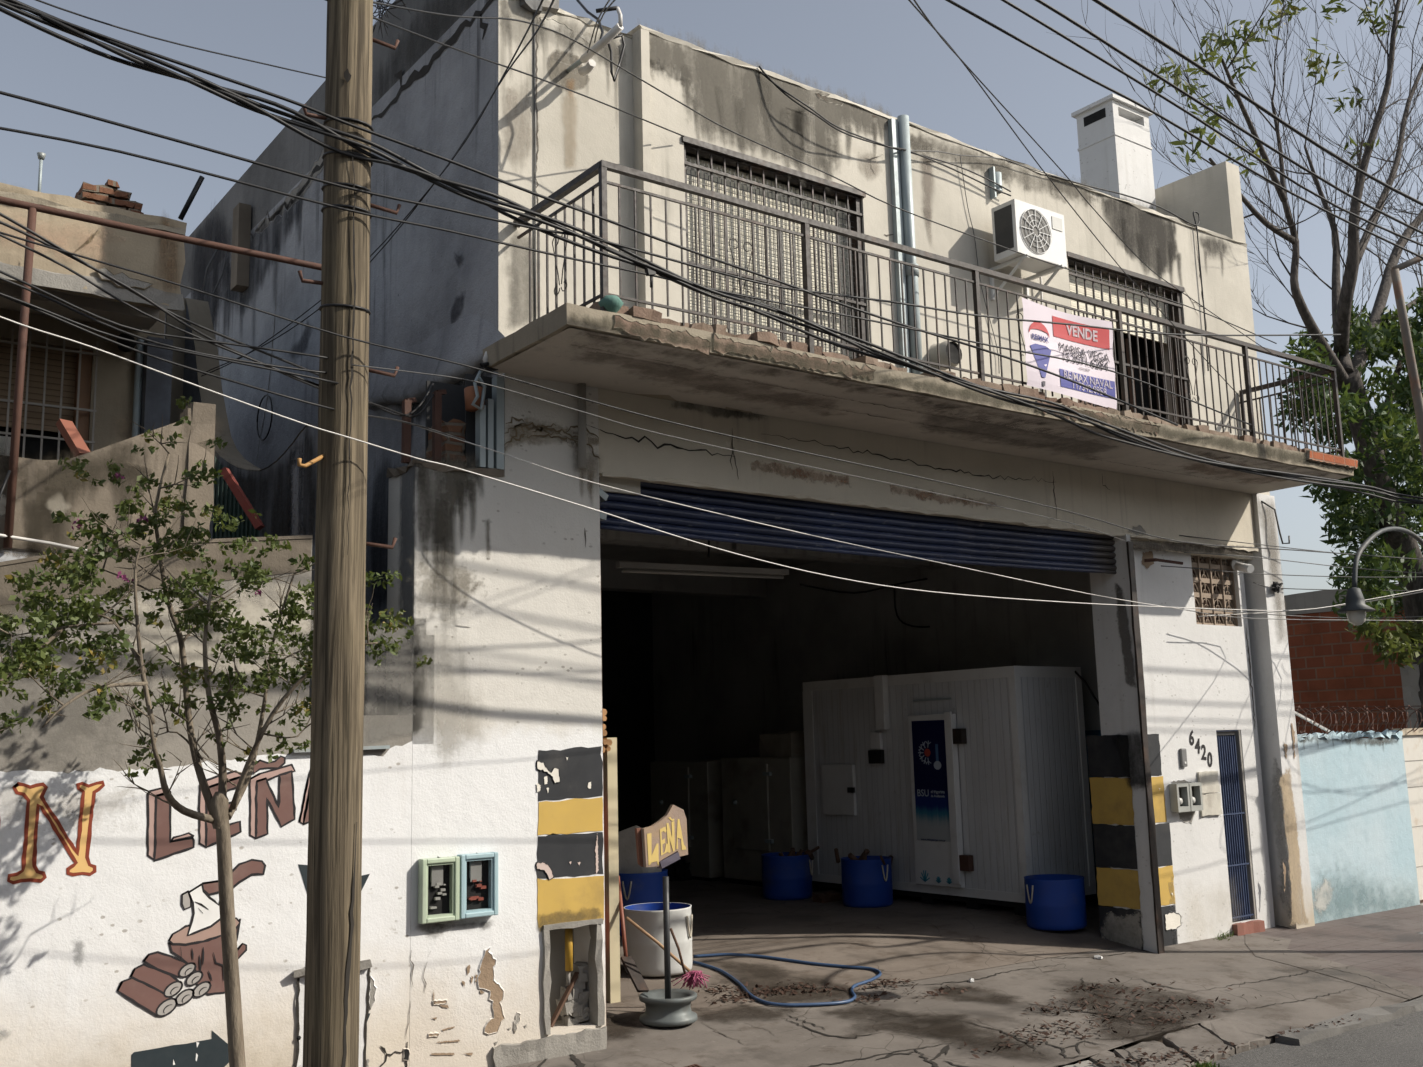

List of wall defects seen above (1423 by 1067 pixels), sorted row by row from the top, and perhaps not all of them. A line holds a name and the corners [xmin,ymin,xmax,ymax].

water stain [535,16,623,82]
water stain [649,34,890,198]
water stain [910,135,1185,293]
water stain [1201,239,1225,262]
water stain [451,296,463,323]
water stain [371,456,489,647]
peeling [536,757,568,792]
peeling [535,861,554,880]
peeling [462,946,527,1045]